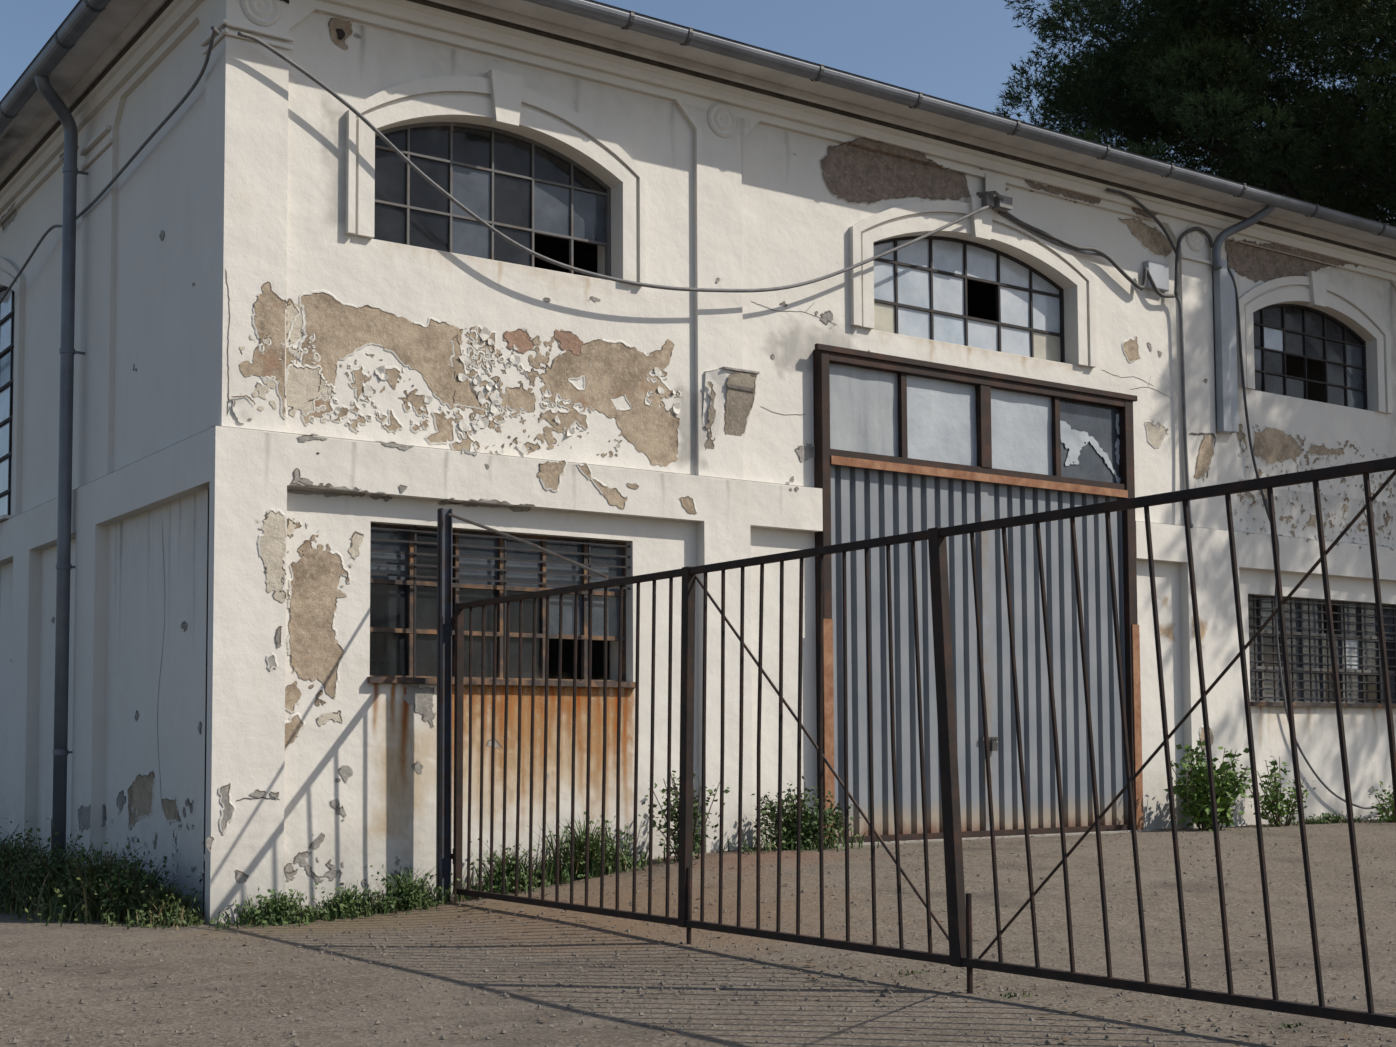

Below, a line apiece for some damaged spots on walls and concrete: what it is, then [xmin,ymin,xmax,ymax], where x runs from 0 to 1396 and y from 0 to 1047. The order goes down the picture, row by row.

flaking render [819,137,971,206]
flaking render [1117,210,1173,259]
flaking render [1223,237,1373,284]
flaking render [239,282,682,509]
flaking render [1234,423,1396,551]
flaking render [256,508,364,747]
corrosion [374,683,409,765]
corrosion [452,684,634,780]
flaking render [77,769,236,898]
peeling [235,870,249,884]
peeling [249,789,279,800]
peeling [284,832,345,885]